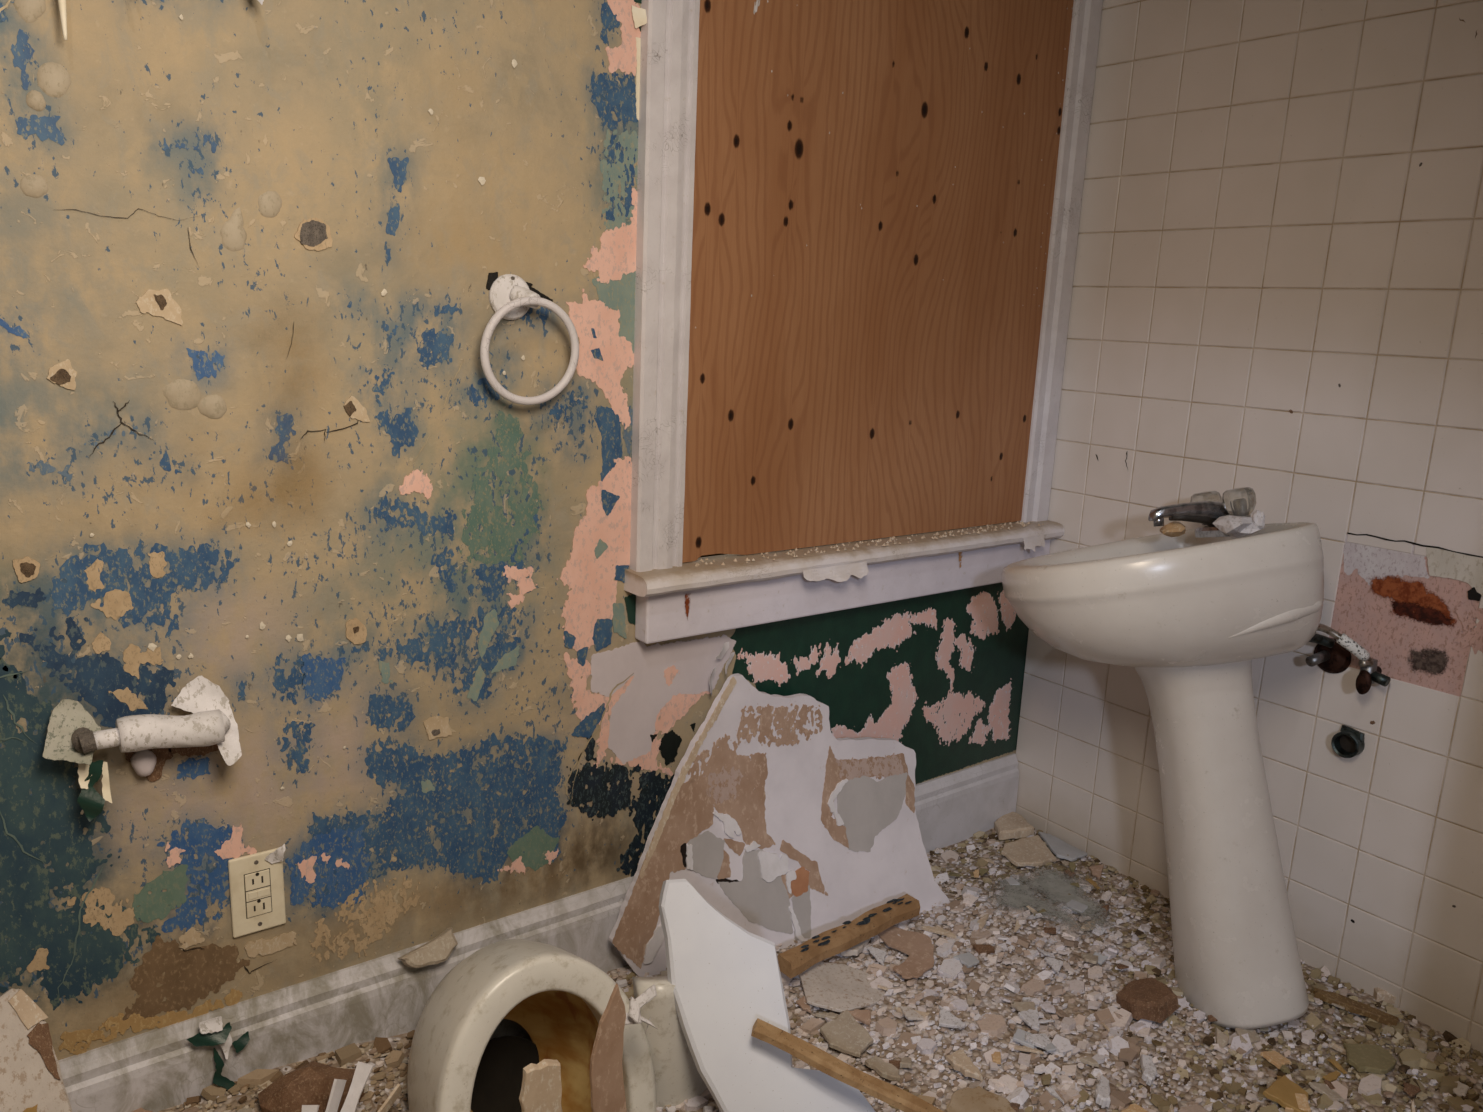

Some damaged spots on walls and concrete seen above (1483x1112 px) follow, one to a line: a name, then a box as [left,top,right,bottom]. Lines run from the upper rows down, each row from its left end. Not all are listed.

peeling [600,129,638,231]
spalling [294,217,333,251]
peeling [601,490,620,516]
flaking render [134,541,167,578]
peeling [615,565,629,583]
flaking render [84,558,163,711]
peeling [1329,534,1480,697]
peeling [709,590,1016,746]
peeling [157,842,186,868]
flaking render [27,948,50,973]
flaking render [59,877,420,1090]
peeling [8,989,49,1030]